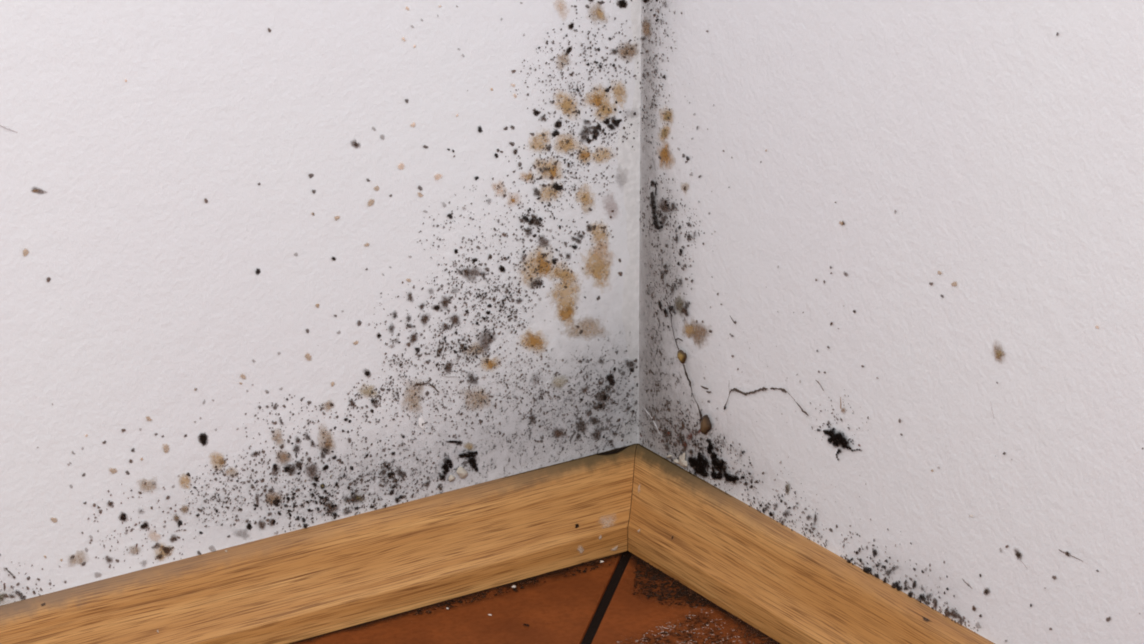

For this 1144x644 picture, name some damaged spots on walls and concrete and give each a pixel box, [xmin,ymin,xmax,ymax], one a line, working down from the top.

water stain [60,0,982,631]
crack [669,311,808,421]
water stain [0,555,66,602]
water stain [629,613,732,644]